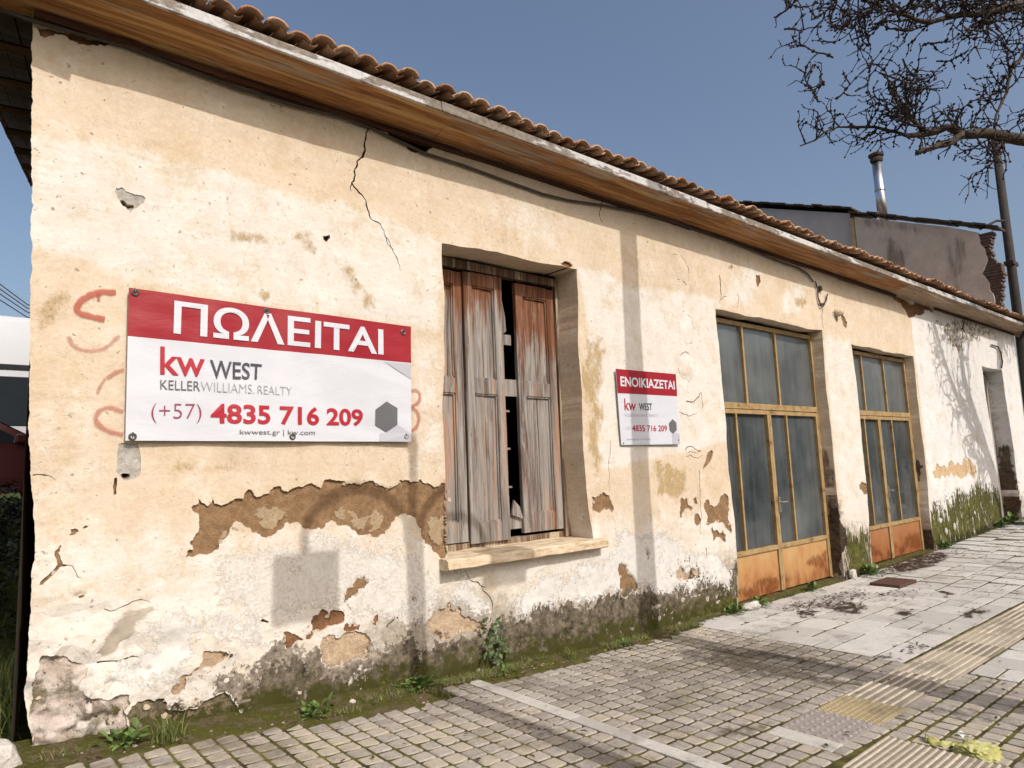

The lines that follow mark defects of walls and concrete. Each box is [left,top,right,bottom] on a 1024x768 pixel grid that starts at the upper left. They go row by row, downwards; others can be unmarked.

crack [350,129,401,271]
spalling [36,545,67,585]
peeling [97,479,493,731]
water stain [135,553,738,731]
peeling [509,492,735,624]
peeling [933,458,977,479]
water stain [922,445,1022,550]
water stain [64,695,121,736]